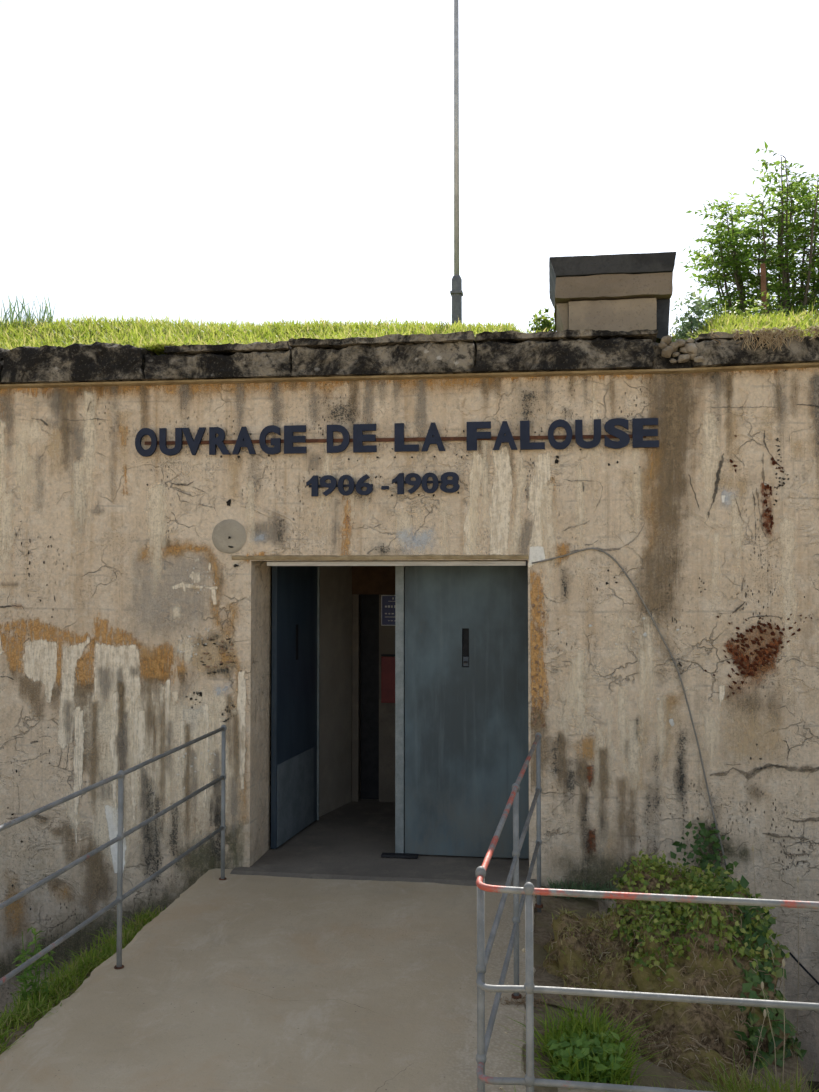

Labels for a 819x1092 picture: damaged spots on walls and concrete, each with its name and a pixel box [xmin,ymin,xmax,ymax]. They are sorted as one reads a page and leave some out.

crack [688,404,819,544]
spalling [177,628,235,675]
water stain [0,371,748,891]
crack [720,578,781,619]
rust [717,614,812,698]
water stain [781,518,796,670]
crack [0,736,61,836]
peeling [23,637,235,873]
crack [710,740,819,779]